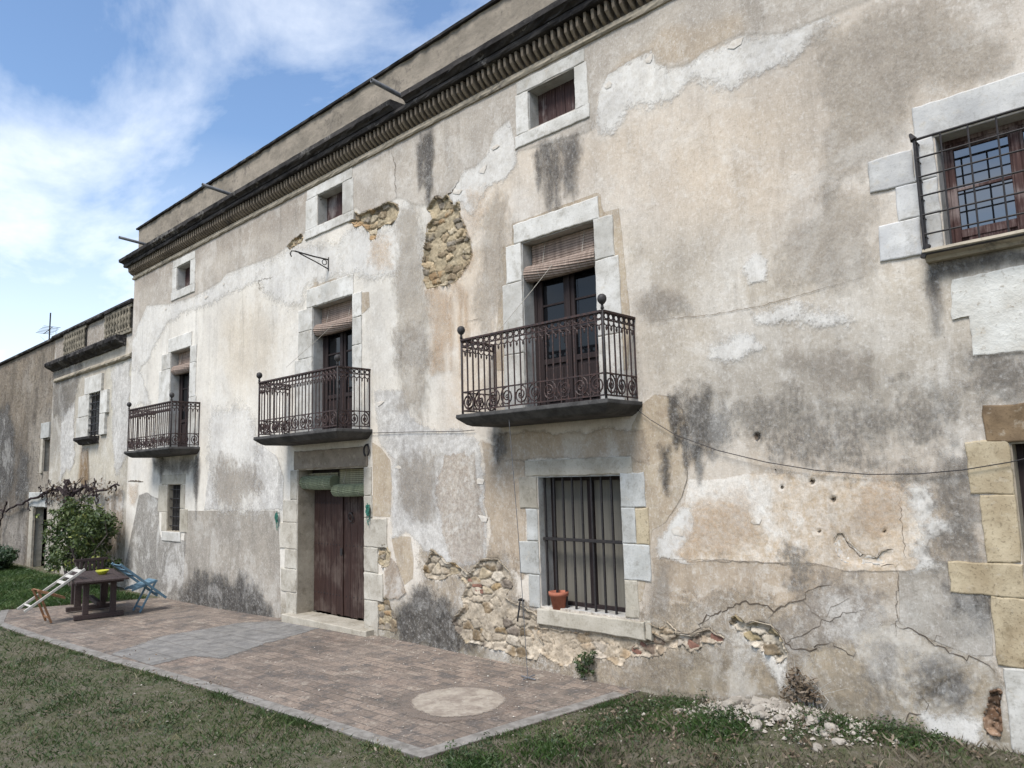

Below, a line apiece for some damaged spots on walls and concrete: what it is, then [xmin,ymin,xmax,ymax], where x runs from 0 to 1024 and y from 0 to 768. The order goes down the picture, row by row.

leakage [534,136,579,210]
spalling [111,121,517,474]
leakage [393,130,436,418]
leakage [661,378,958,489]
leakage [179,570,272,617]
peeling [369,389,813,690]
crack [662,559,864,656]
crack [834,498,988,665]
peeling [920,688,1003,747]